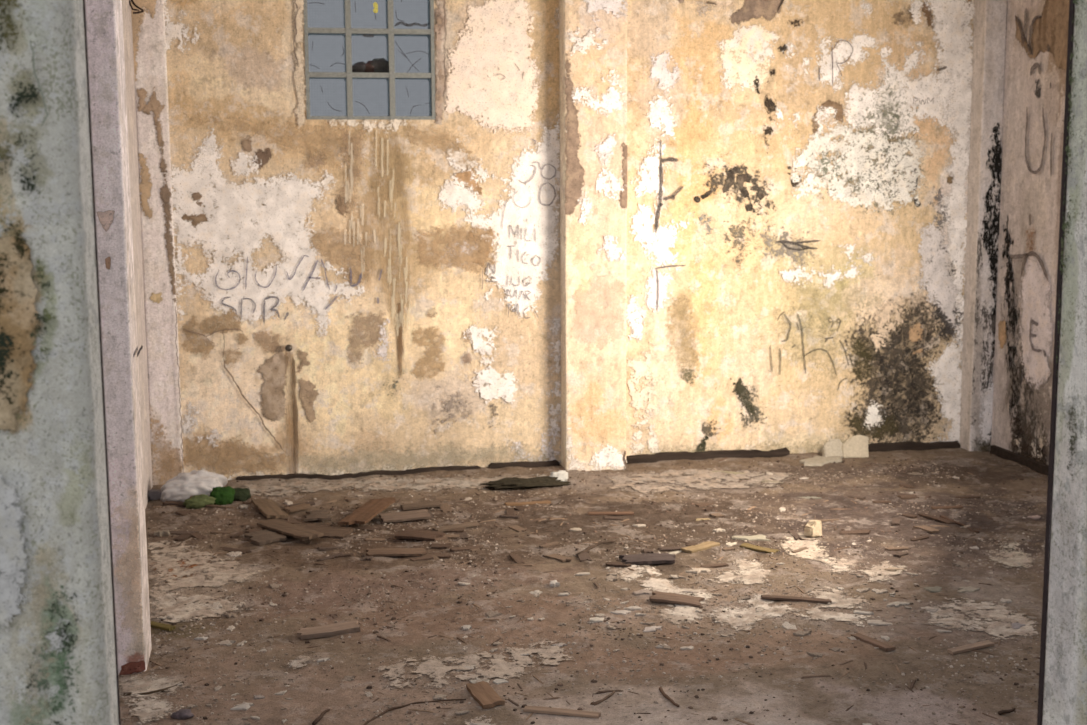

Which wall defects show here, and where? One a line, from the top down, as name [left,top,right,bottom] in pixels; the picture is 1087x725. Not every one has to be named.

peeling [0,236,39,433]
peeling [131,0,365,337]
peeling [437,0,689,471]
peeling [678,0,975,443]
leakage [794,80,962,290]
leakage [839,122,1047,464]